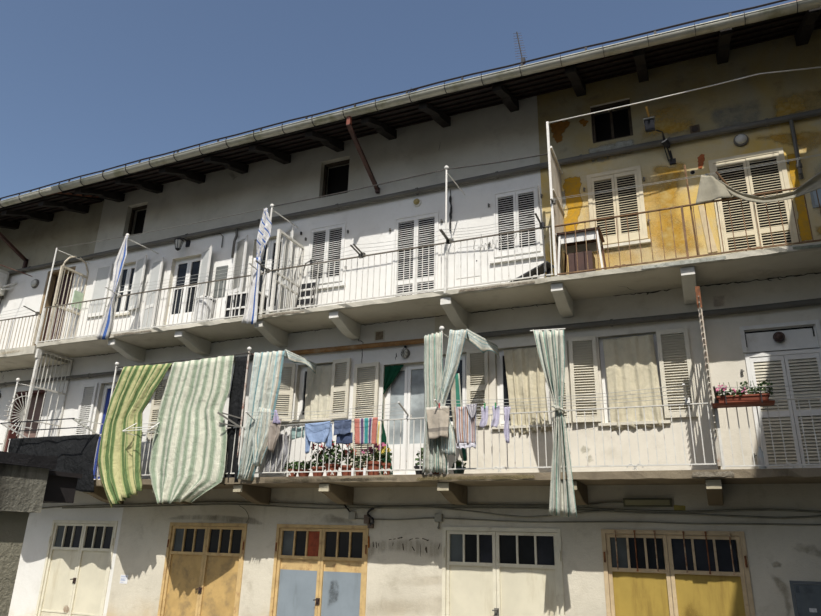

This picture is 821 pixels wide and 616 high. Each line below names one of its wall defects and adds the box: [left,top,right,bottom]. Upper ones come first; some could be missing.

peeling [550,119,588,143]